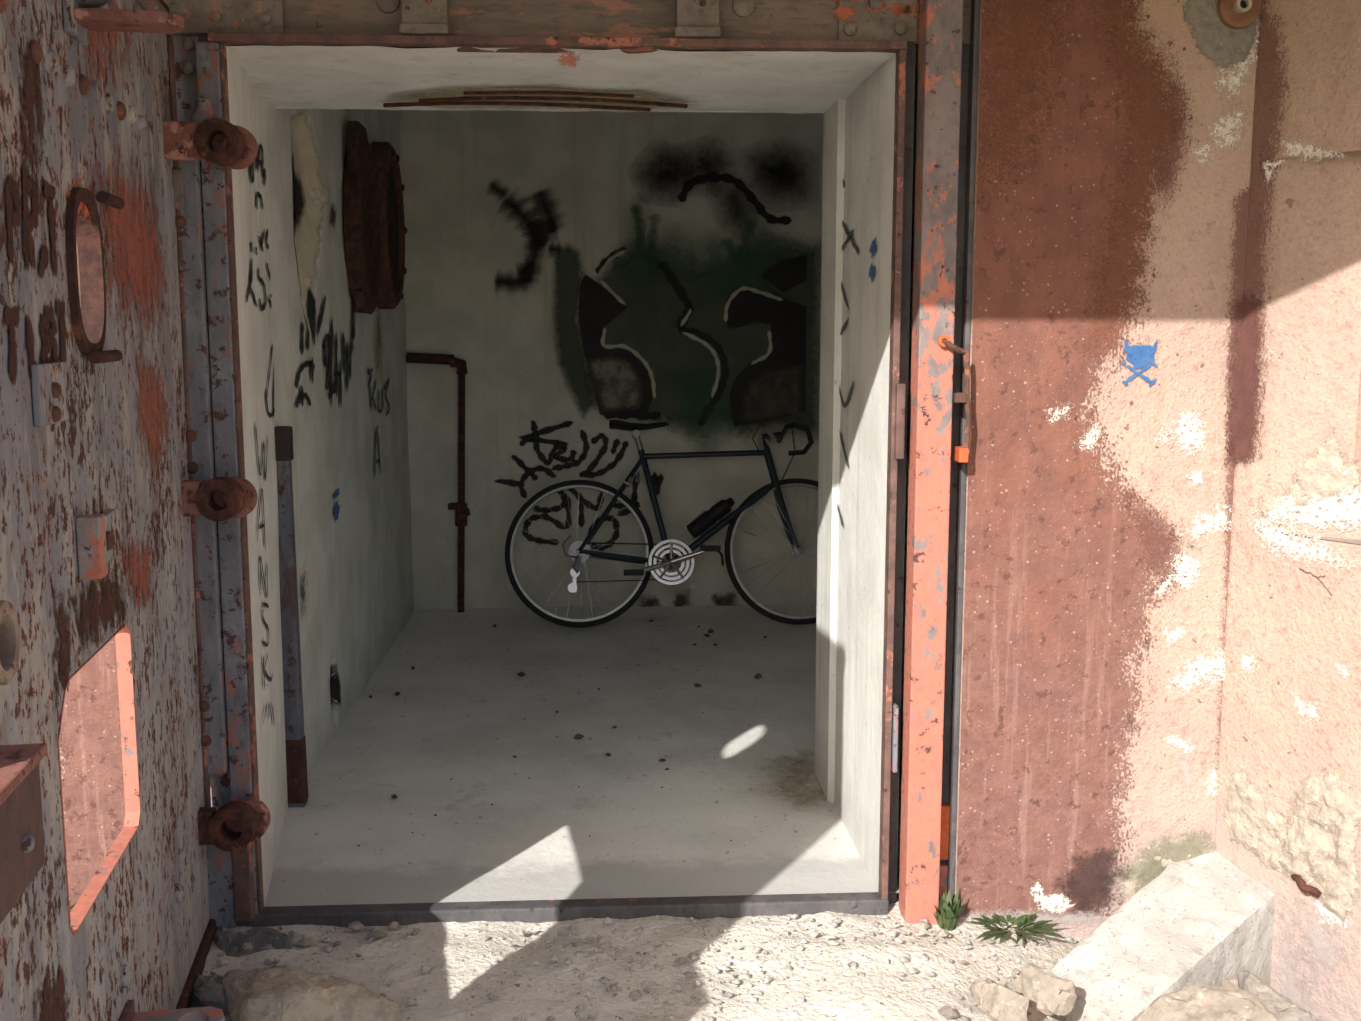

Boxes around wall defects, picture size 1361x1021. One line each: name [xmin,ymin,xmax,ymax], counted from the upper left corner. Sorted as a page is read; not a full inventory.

corrosion [17,20,46,185]
peeling [1150,13,1262,202]
peeling [1262,139,1344,186]
corrosion [67,141,170,488]
leakage [1215,0,1292,769]
corrosion [52,538,155,711]
corrosion [34,962,70,1021]
peeling [1313,898,1353,932]